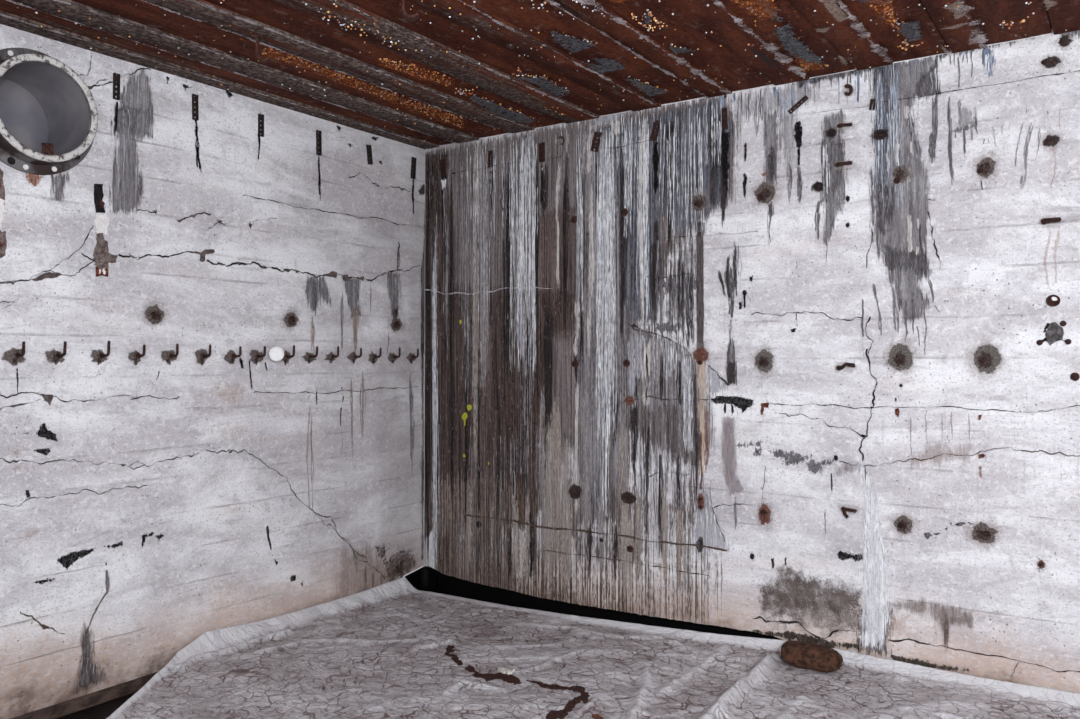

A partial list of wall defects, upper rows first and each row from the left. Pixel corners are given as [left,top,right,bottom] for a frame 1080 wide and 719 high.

corrosion [260,48,463,127]
corrosion [550,31,669,97]
corrosion [733,0,824,71]
leakage [51,173,69,200]
crack [0,195,420,306]
leakage [110,0,1015,623]
crack [0,392,180,410]
crack [751,311,1080,467]
crack [20,611,65,634]
leakage [79,571,110,686]
crack [0,449,385,579]
leakage [752,464,971,671]